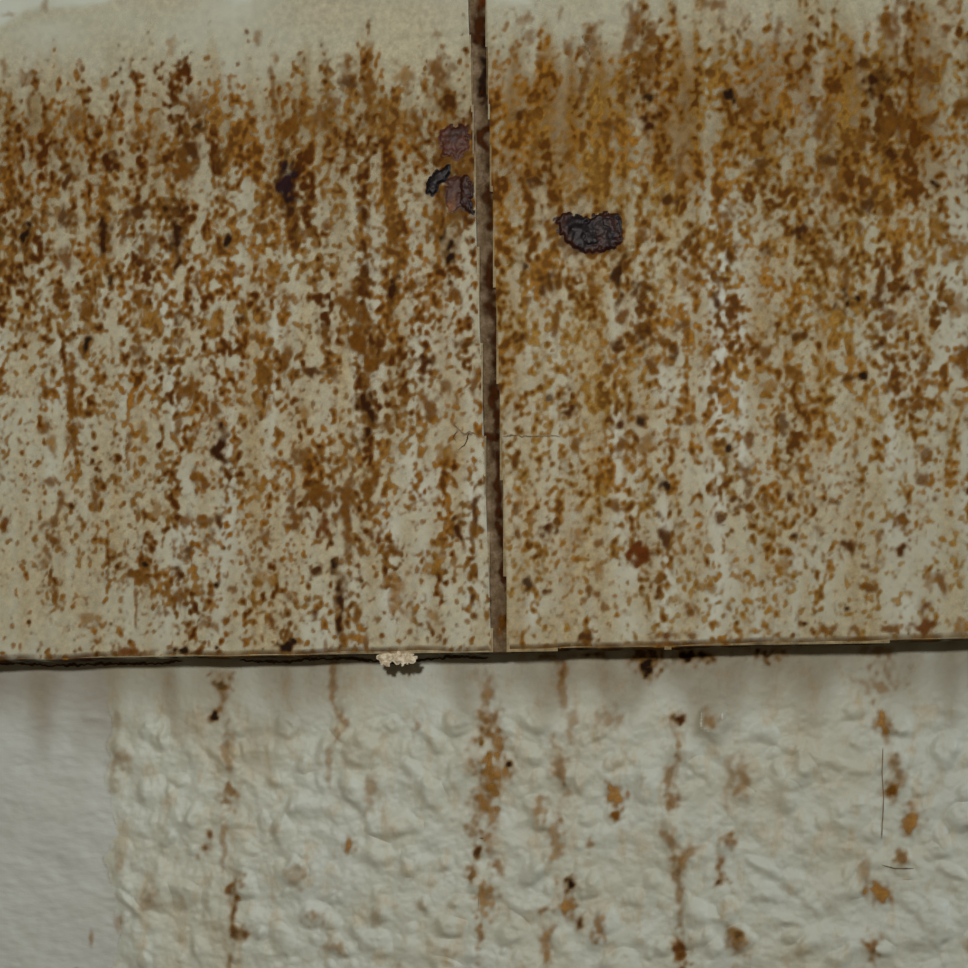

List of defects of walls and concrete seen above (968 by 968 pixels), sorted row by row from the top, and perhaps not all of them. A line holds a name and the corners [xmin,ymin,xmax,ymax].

damp [0,37,205,187]
damp [260,0,474,165]
damp [485,19,538,157]
damp [575,79,672,171]
damp [619,0,968,125]
corrosion [0,0,968,679]
crack [452,422,477,450]
corrosion [476,712,512,822]
corrosion [555,759,565,784]
corrosion [468,846,494,941]
corrosion [542,929,552,960]
corrosion [560,876,583,929]